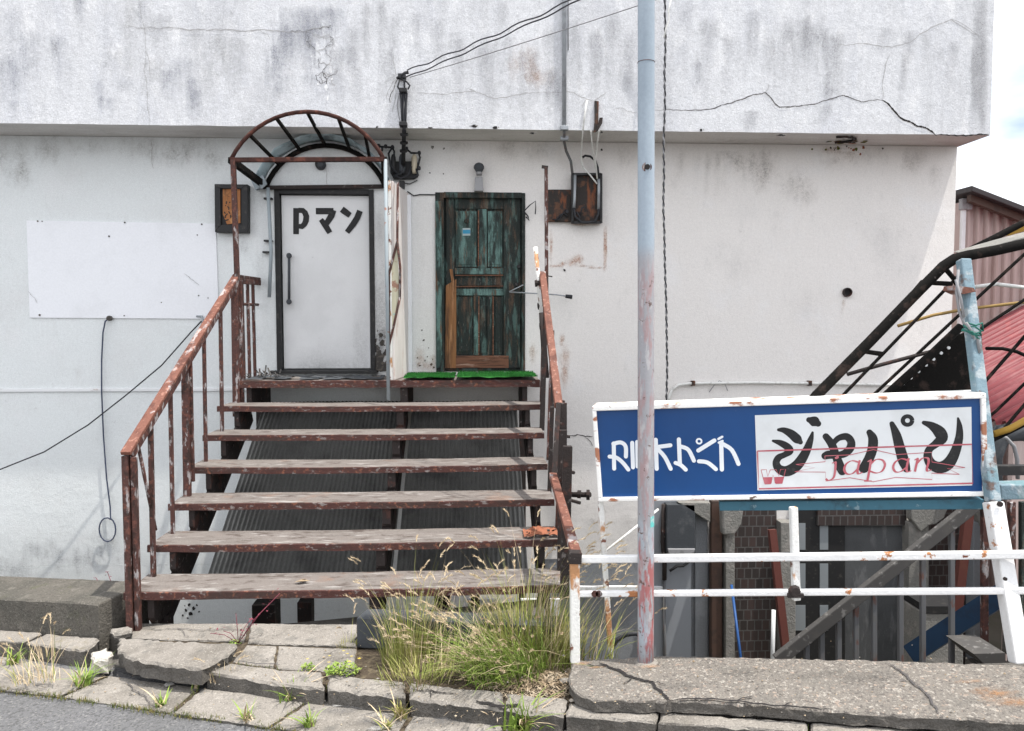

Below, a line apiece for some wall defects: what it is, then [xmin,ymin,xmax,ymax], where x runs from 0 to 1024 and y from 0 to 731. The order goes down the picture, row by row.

crack [663,19,988,137]
crack [589,662,827,710]
crack [888,663,938,712]